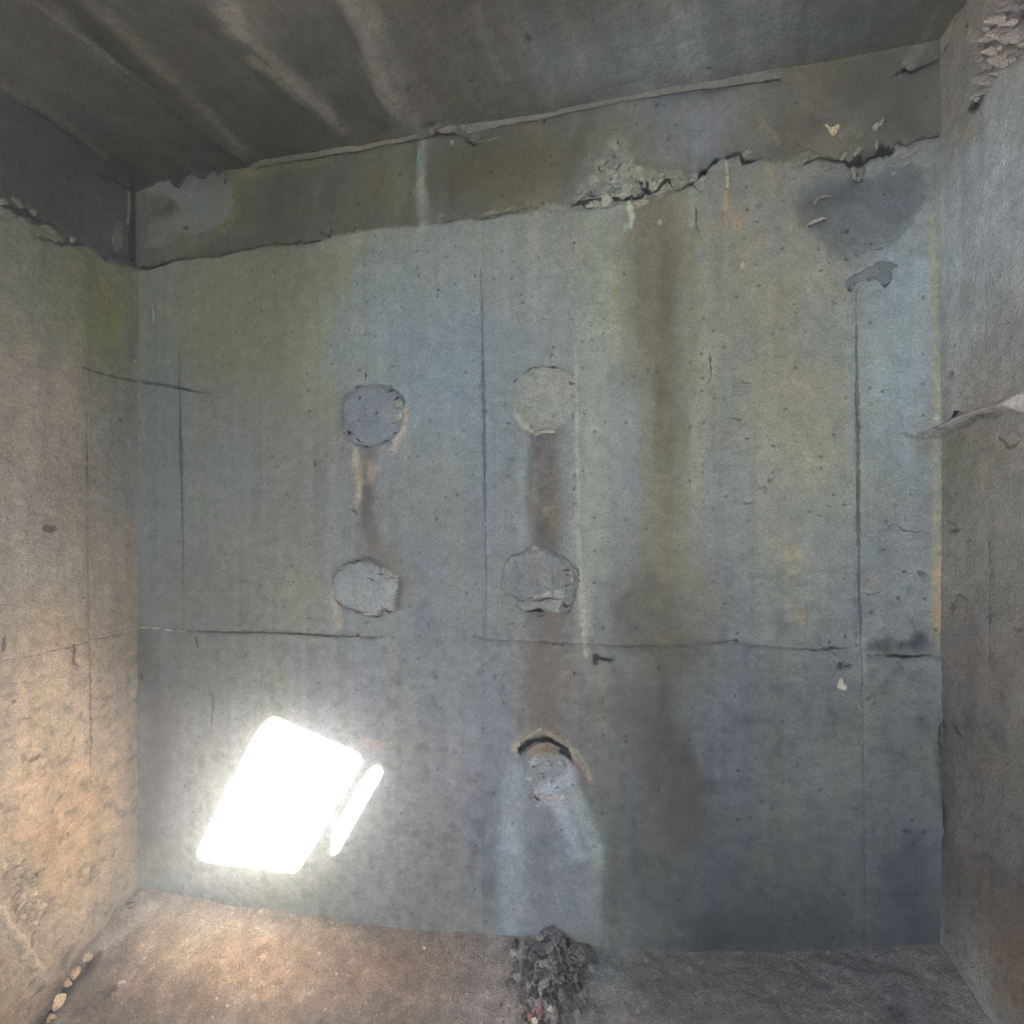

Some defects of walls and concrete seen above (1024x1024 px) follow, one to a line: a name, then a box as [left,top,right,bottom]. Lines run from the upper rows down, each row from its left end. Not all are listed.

spalling [968,0,1024,103]
spalling [561,133,702,214]
crack [672,149,772,239]
leakage [792,161,930,265]
crack [797,118,940,184]
crack [81,354,208,601]
leakage [506,151,862,872]
rust [927,440,942,646]